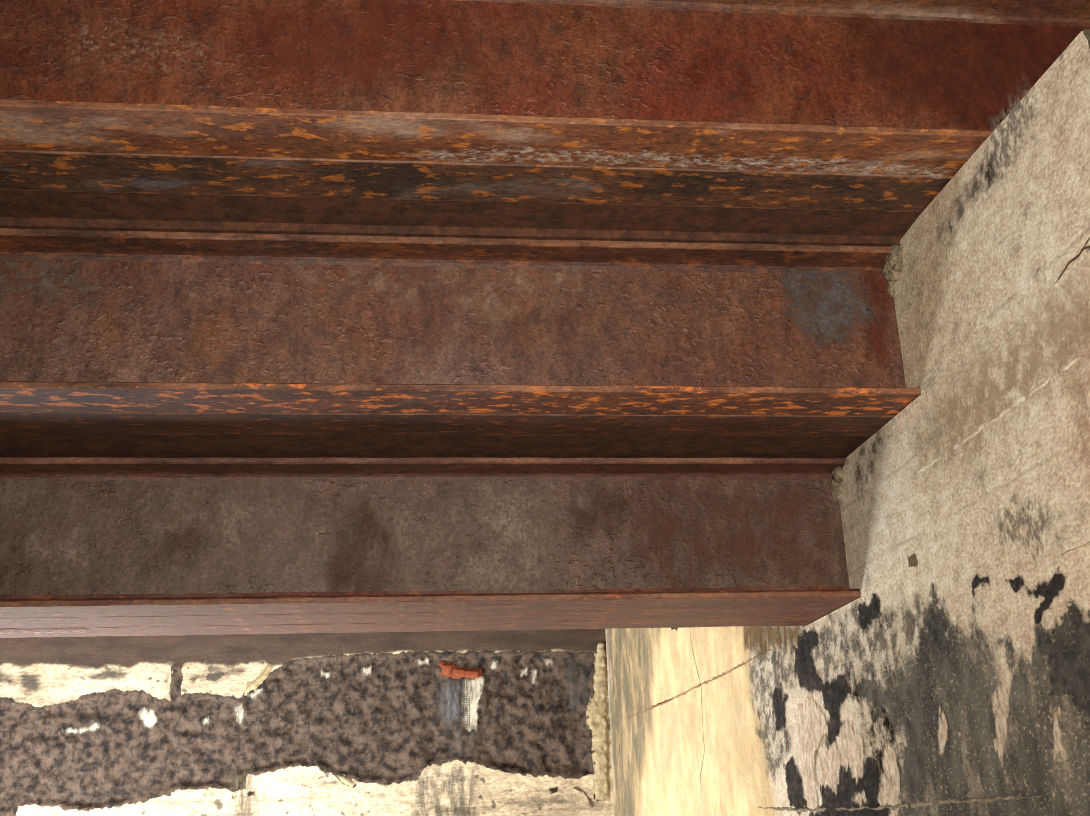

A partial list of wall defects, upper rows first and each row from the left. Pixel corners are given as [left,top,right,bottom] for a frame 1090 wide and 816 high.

rust [851,17,1080,120]
crack [1055,237,1090,283]
flaking render [0,650,596,816]